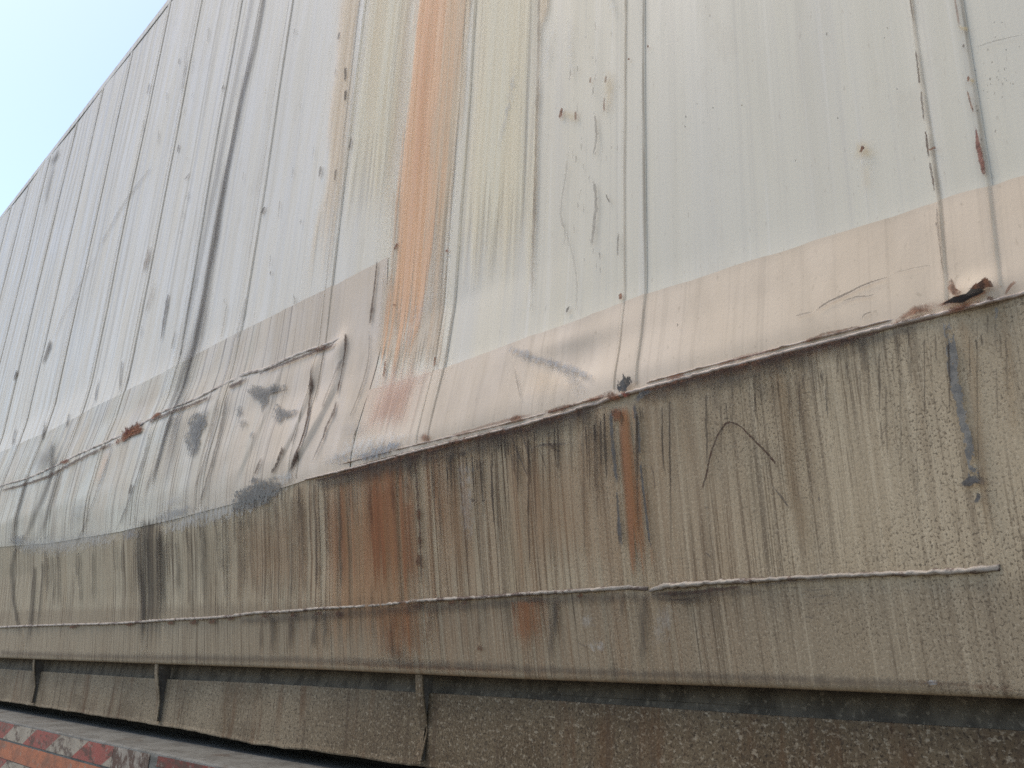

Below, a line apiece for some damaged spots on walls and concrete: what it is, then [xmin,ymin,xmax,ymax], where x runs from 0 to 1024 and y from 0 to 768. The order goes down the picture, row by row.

rust [381,0,469,376]
rust [975,130,985,174]
rust [895,306,928,323]
peeling [939,279,998,318]
damp [924,336,951,409]
rust [116,413,160,443]
rust [324,404,578,478]
damp [662,402,671,490]
rust [586,327,855,570]
peeling [943,323,984,502]
damp [356,412,607,561]